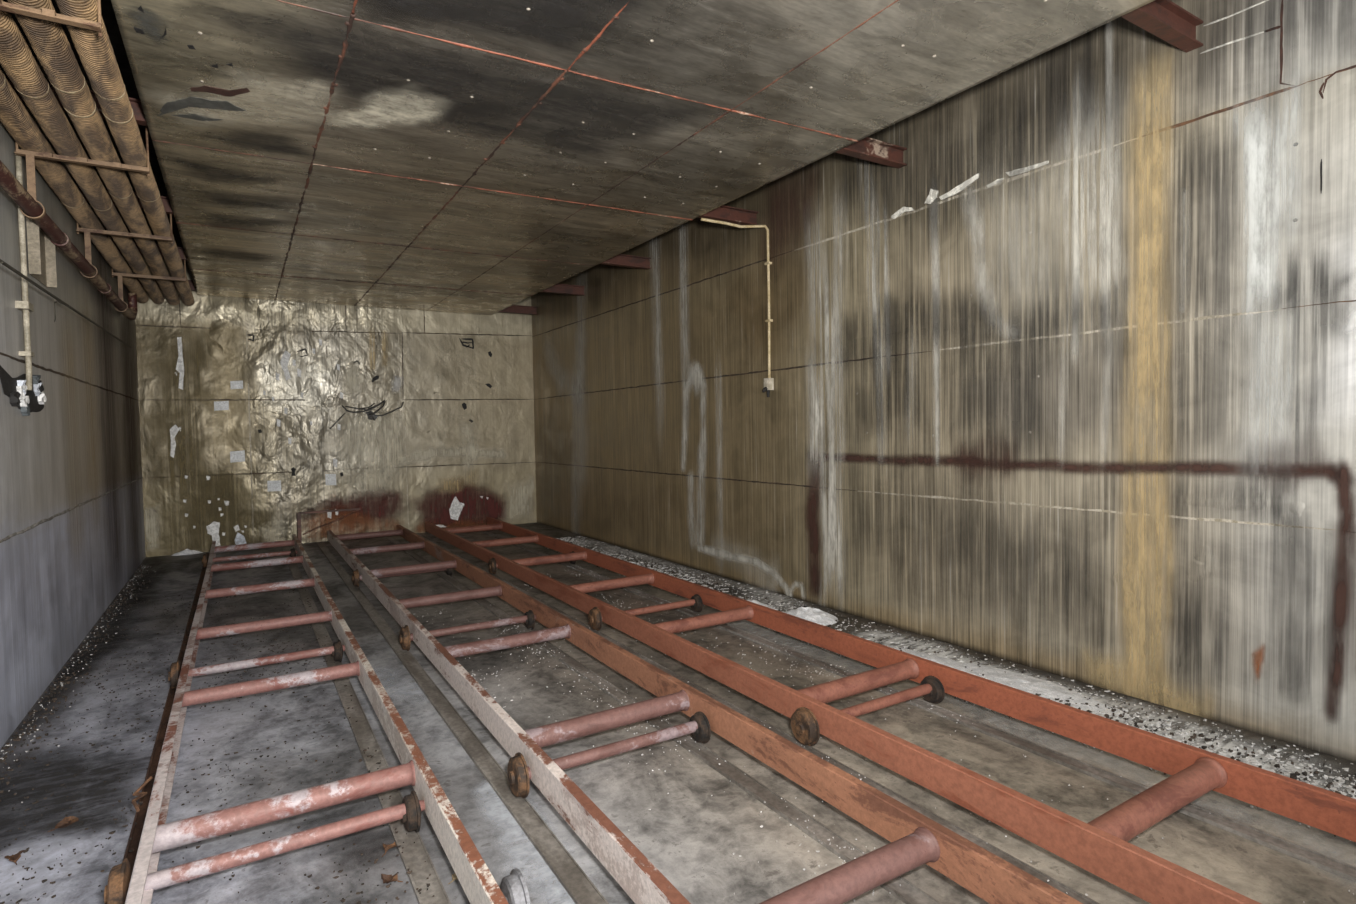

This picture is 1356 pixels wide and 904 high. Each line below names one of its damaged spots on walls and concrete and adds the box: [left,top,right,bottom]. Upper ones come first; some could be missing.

leakage [240,22,680,150]
leakage [1017,21,1111,346]
leakage [1244,119,1286,299]
leakage [932,160,959,453]
rust [303,491,400,533]
rust [418,481,506,532]
leakage [682,364,803,602]
leakage [810,372,842,579]
leakage [47,557,163,700]
leakage [860,632,1025,675]
leakage [0,752,151,848]
leakage [1081,693,1319,787]